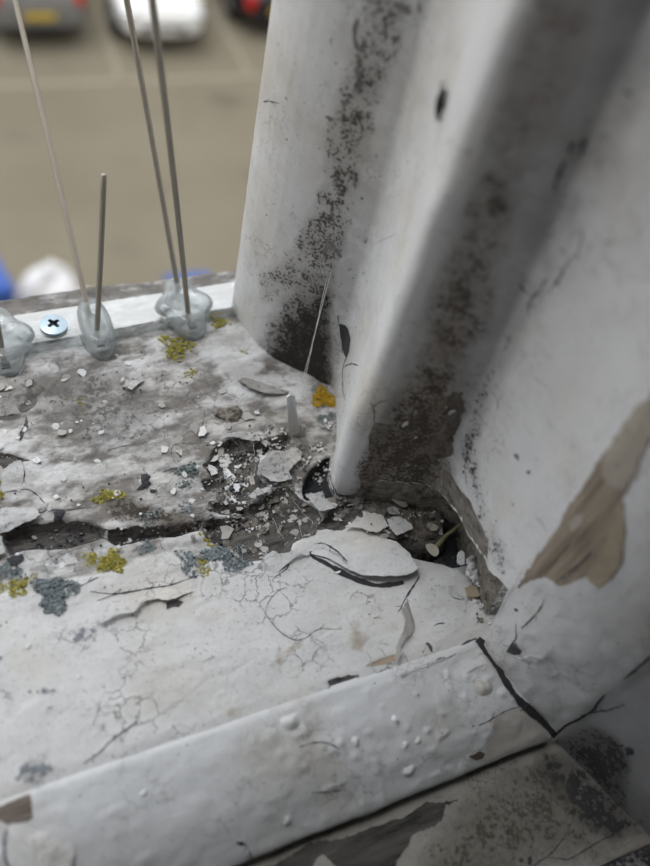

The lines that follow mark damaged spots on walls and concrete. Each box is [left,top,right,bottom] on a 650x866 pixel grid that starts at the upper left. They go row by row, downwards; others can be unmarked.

leakage [259,0,405,384]
leakage [357,172,514,494]
peeling [248,446,302,499]
peeling [0,507,40,555]
peeling [257,499,419,577]
crack [266,564,328,641]
crack [309,551,420,612]
crack [462,599,625,738]
crack [83,721,138,764]
leakage [568,727,633,805]
peeling [274,799,458,866]
leakage [603,845,650,866]